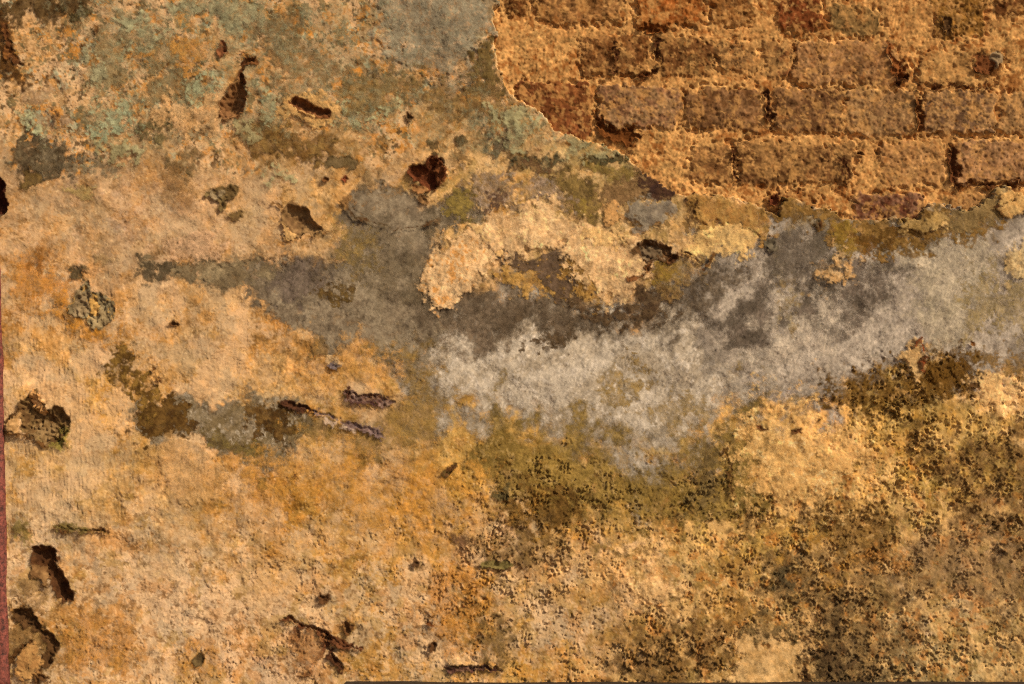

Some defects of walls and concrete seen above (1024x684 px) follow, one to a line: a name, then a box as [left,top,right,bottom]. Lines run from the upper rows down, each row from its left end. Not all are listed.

spalling [946,146,963,183]
damp [136,4,1024,537]
spalling [4,388,71,452]
damp [97,342,315,490]
spalling [280,399,385,442]
spalling [343,386,395,408]
spalling [30,544,75,604]
damp [449,460,601,591]
damp [596,417,1024,683]
spalling [8,596,60,684]
spalling [278,615,364,677]
damp [457,592,531,672]